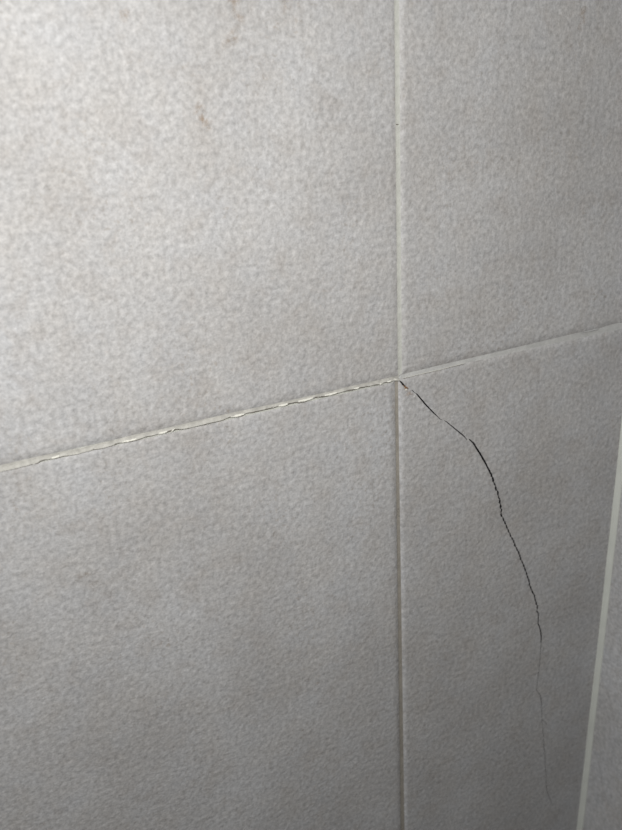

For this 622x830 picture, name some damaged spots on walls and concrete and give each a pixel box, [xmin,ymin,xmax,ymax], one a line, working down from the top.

crack [400,381,552,805]